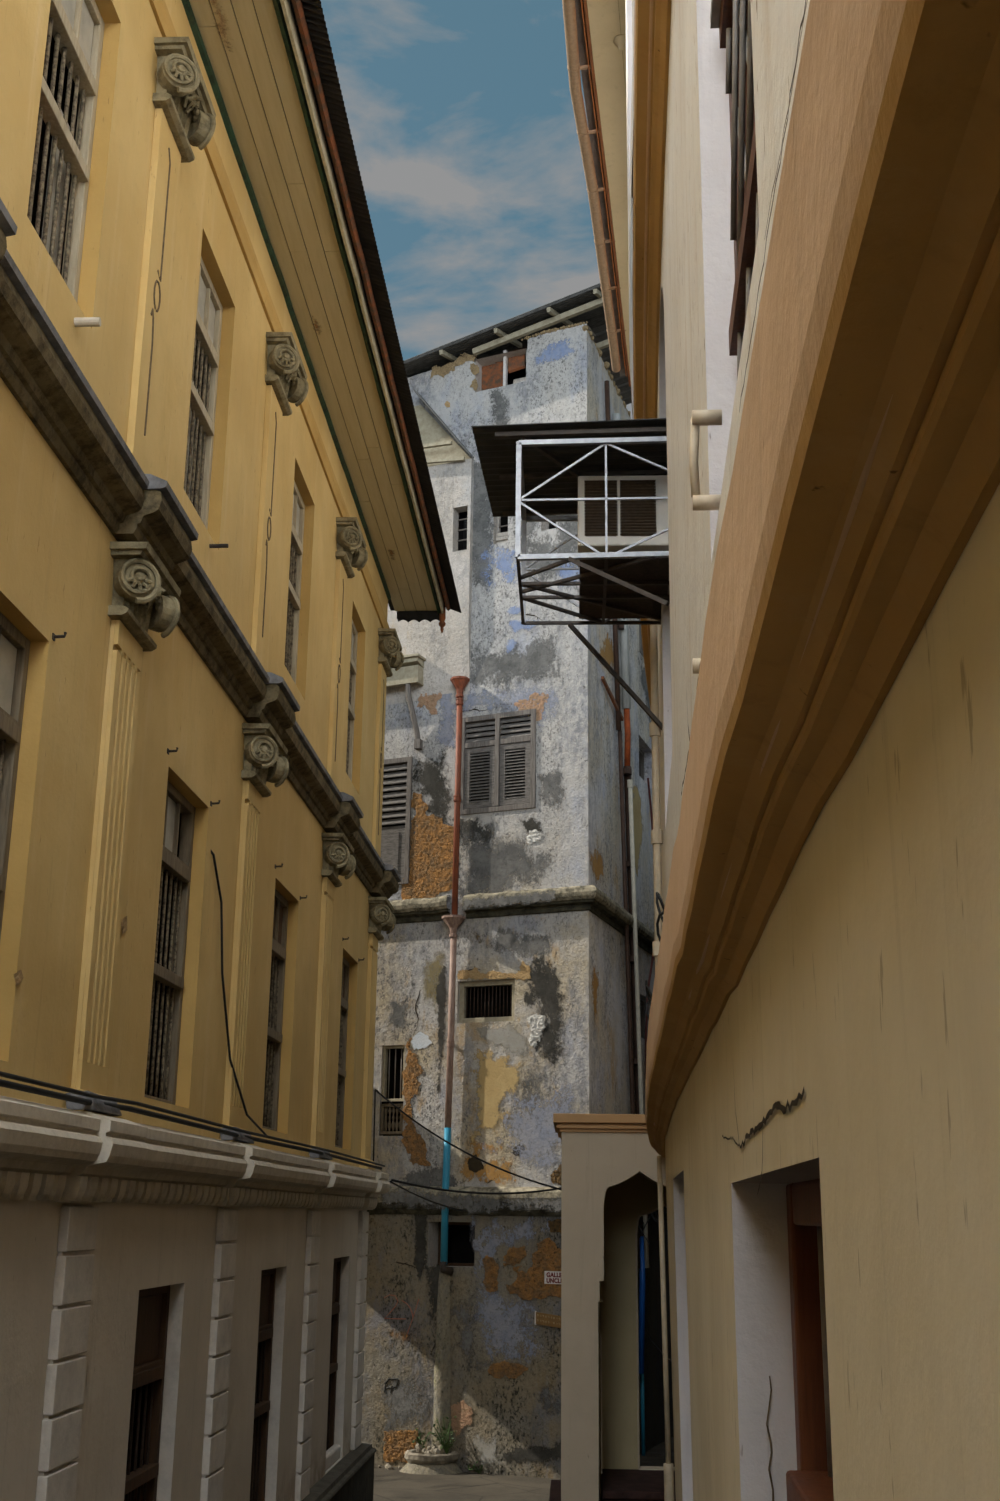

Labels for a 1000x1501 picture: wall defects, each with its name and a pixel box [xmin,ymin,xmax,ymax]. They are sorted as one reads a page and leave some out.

leakage [491,390,510,425]
leakage [472,462,495,591]
leakage [514,516,580,582]
leakage [470,637,564,690]
flaking render [401,792,461,900]
leakage [474,928,565,1112]
peeling [459,1049,576,1185]
peeling [471,1215,561,1379]
flaking render [383,1428,418,1463]
crack [766,1376,774,1501]